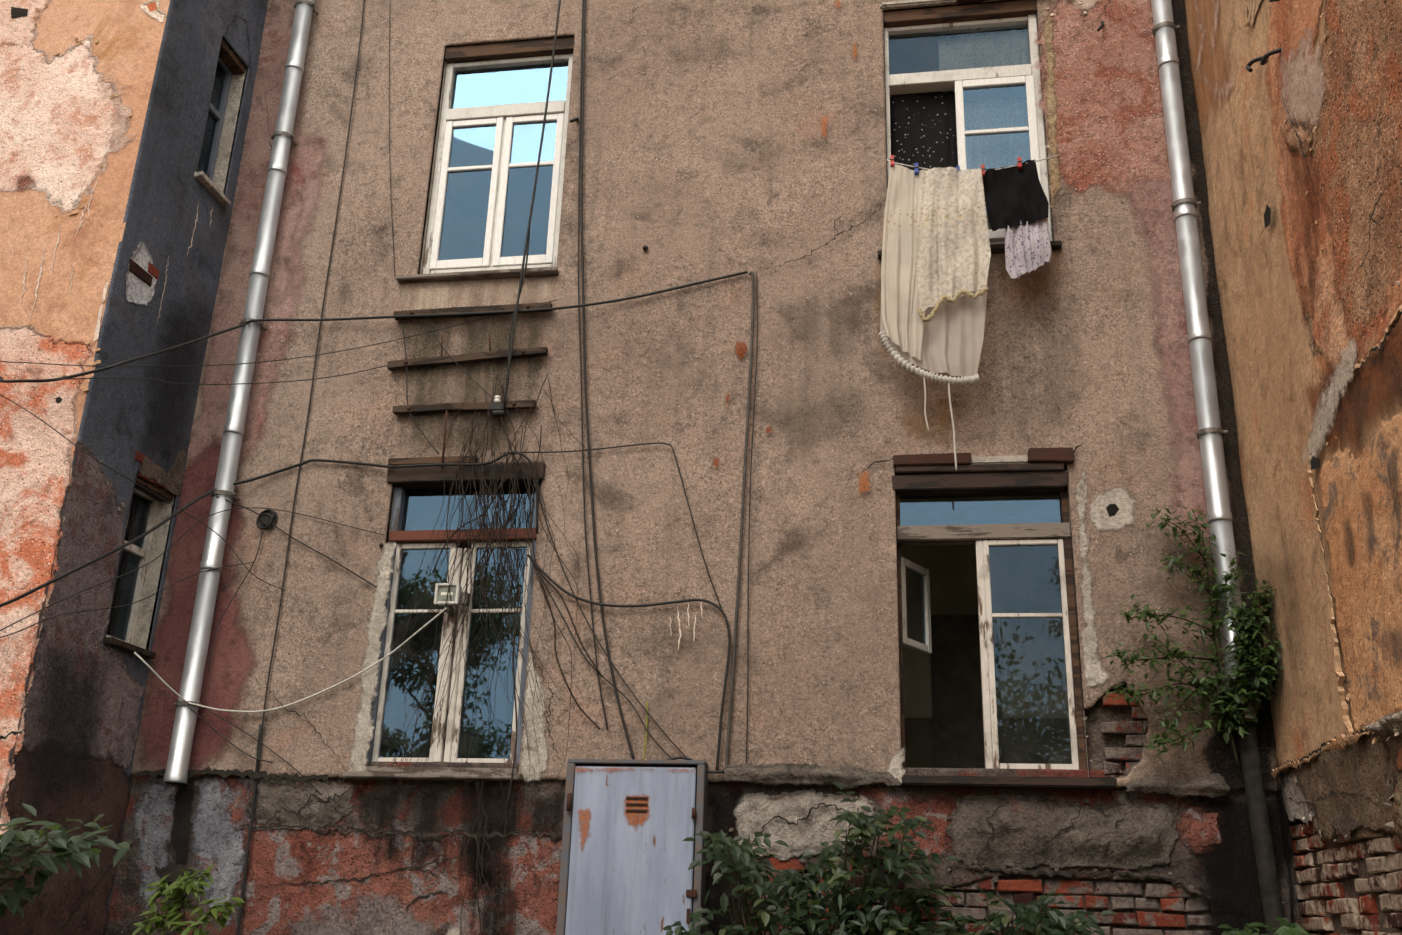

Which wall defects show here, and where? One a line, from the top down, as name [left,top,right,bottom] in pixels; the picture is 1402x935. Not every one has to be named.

peeling [0,0,132,216]
peeling [1035,0,1171,195]
crack [759,199,886,269]
peeling [1244,0,1402,377]
crack [1359,178,1390,268]
crack [1353,304,1402,373]
peeling [0,282,562,935]
crack [233,825,563,911]
rust [578,809,591,850]
rust [625,796,649,826]
flaking render [729,786,1212,935]
flaking render [1281,773,1402,935]